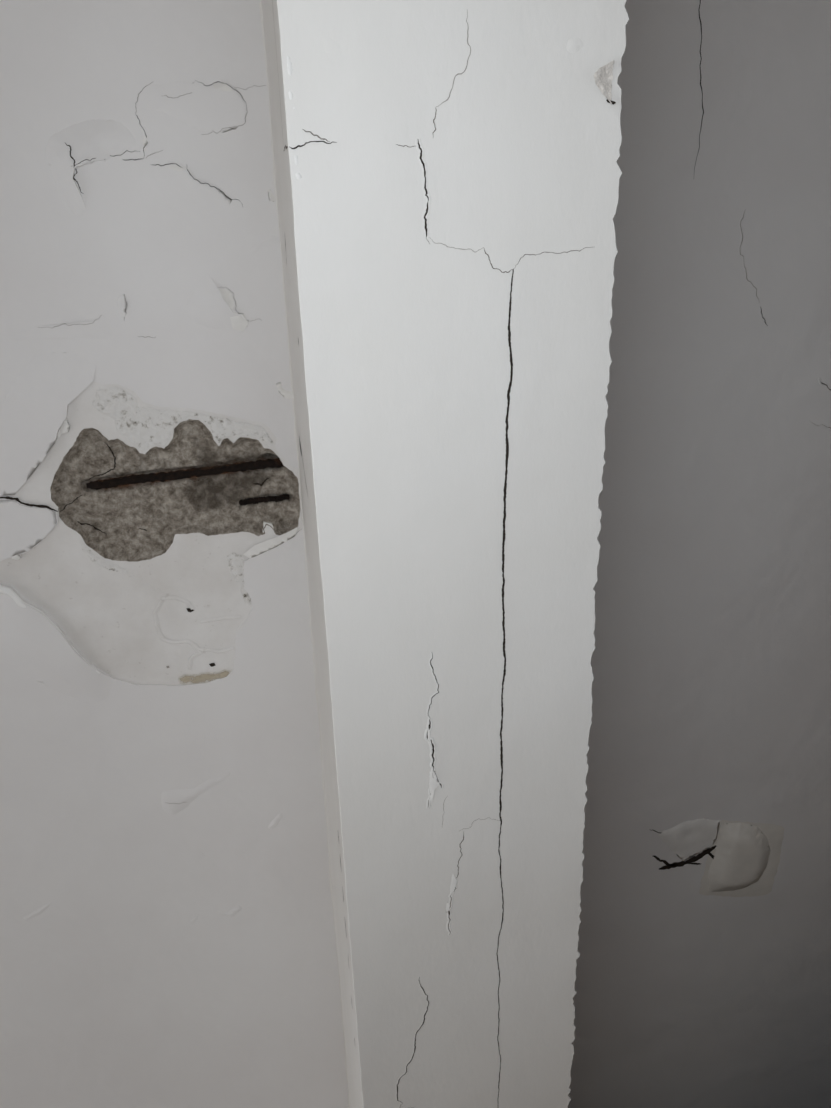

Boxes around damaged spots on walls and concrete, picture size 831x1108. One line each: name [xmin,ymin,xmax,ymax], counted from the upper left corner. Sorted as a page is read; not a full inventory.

crack [272,1,337,149]
crack [694,0,704,170]
spalling [0,352,308,703]
crack [395,12,590,1108]